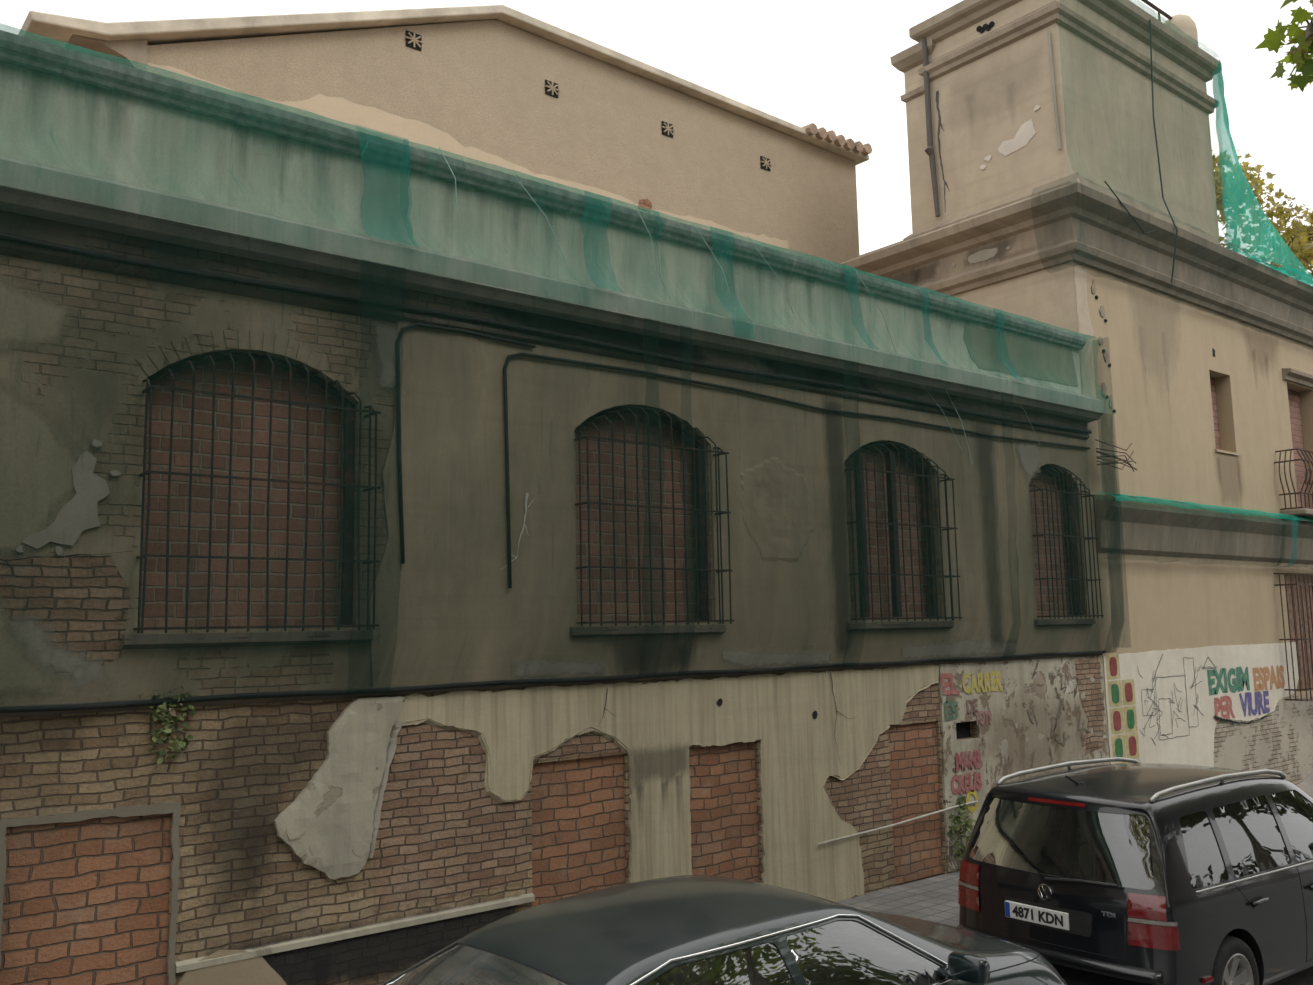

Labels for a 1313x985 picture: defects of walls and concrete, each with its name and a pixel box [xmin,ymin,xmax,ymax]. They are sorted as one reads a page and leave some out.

flaking render [980,105,1040,170]
flaking render [274,696,630,910]
flaking render [823,681,939,826]